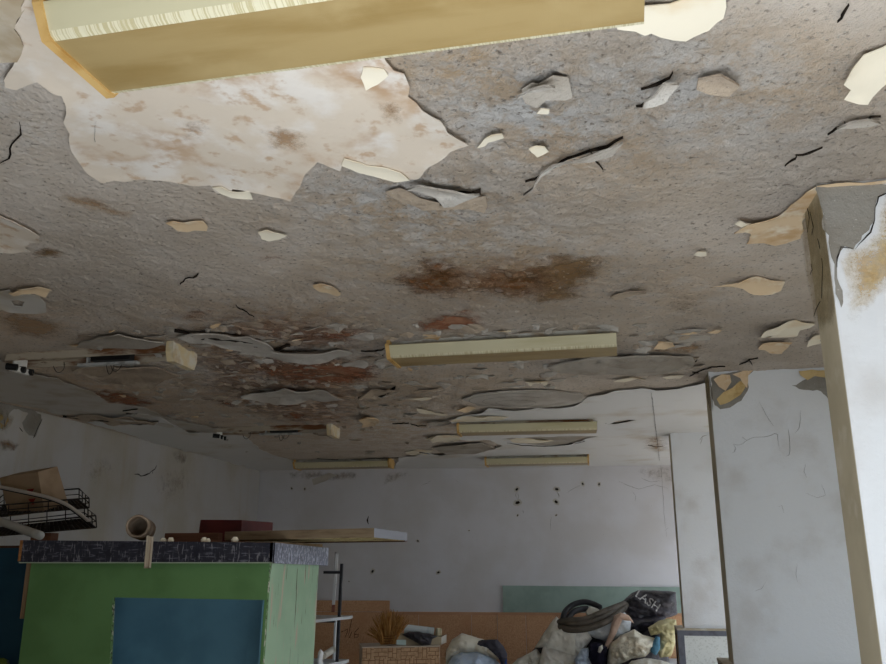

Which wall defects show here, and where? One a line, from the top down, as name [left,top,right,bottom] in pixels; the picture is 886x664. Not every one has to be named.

peeling [617,0,726,41]
peeling [0,0,504,213]
crack [636,71,673,108]
peeling [844,45,886,105]
crack [0,122,22,163]
spalling [523,141,623,196]
crack [558,136,623,170]
crack [785,121,845,166]
spalling [734,180,886,307]
water stain [851,235,886,296]
corrosion [220,349,374,423]
peeling [392,370,754,470]